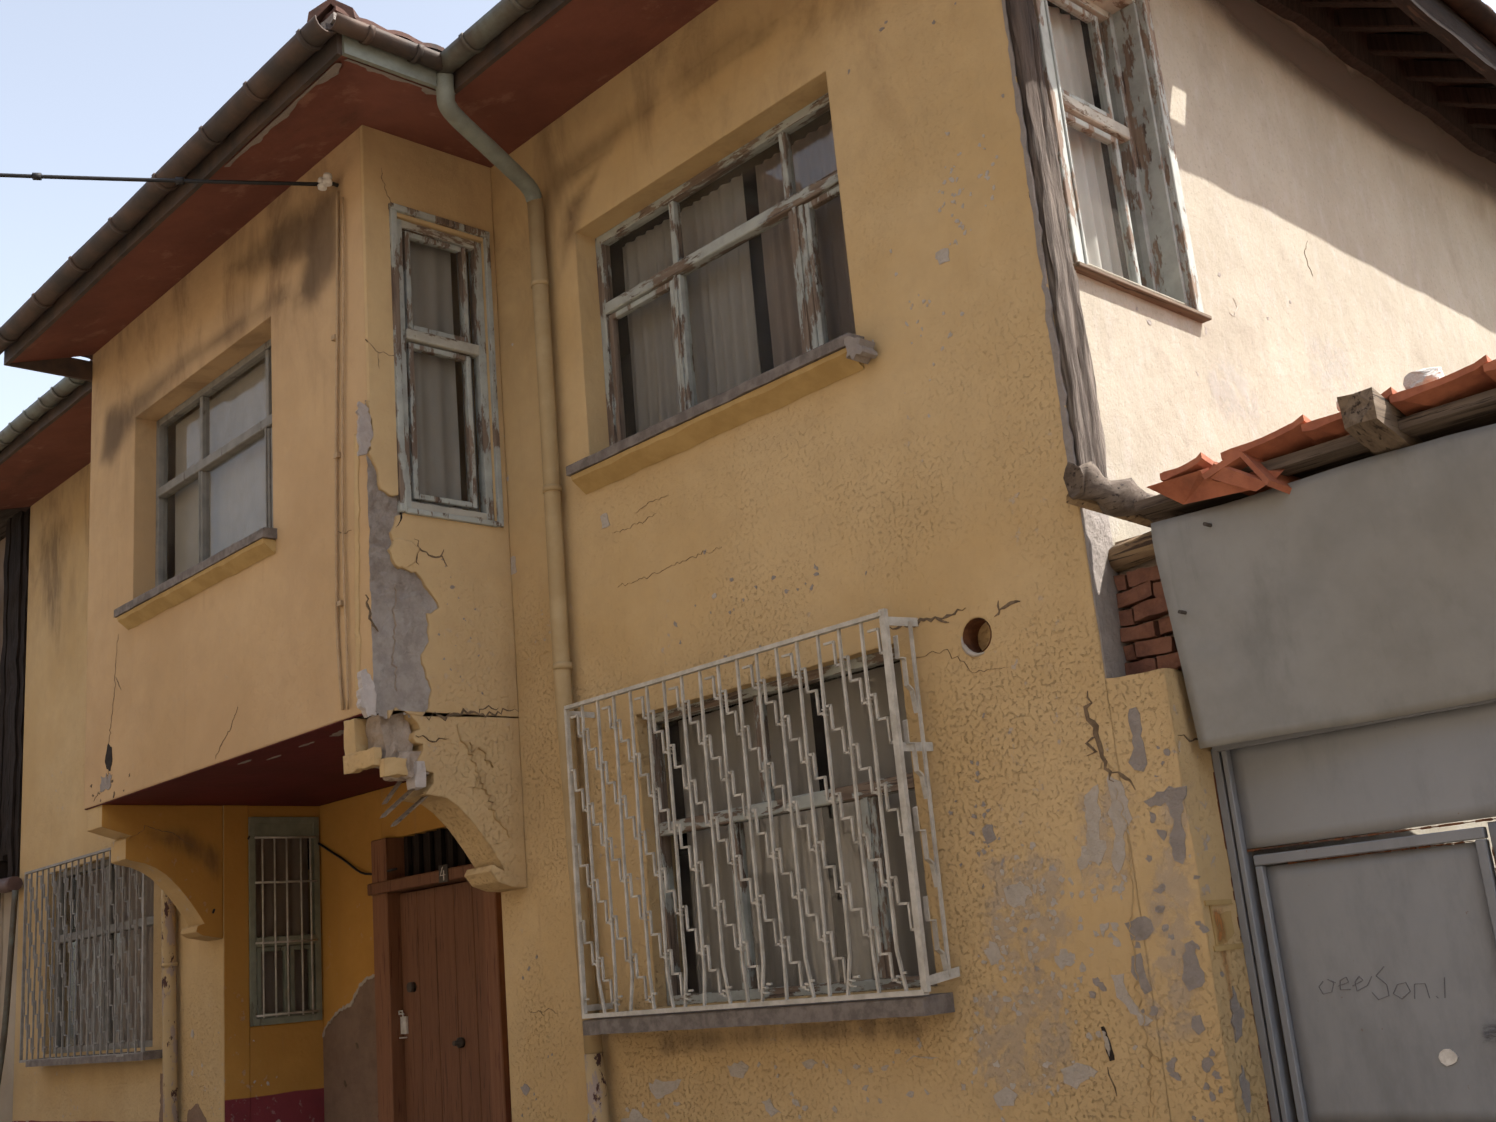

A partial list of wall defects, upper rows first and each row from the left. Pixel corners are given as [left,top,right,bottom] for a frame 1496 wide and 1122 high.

crack [396,512,447,566]
crack [623,547,722,586]
flaking render [331,400,460,827]
crack [889,600,1020,673]
crack [417,705,518,838]
peeling [957,707,1251,1122]
crack [1083,691,1161,1113]
peeling [187,1104,207,1122]
peeling [621,1079,682,1122]